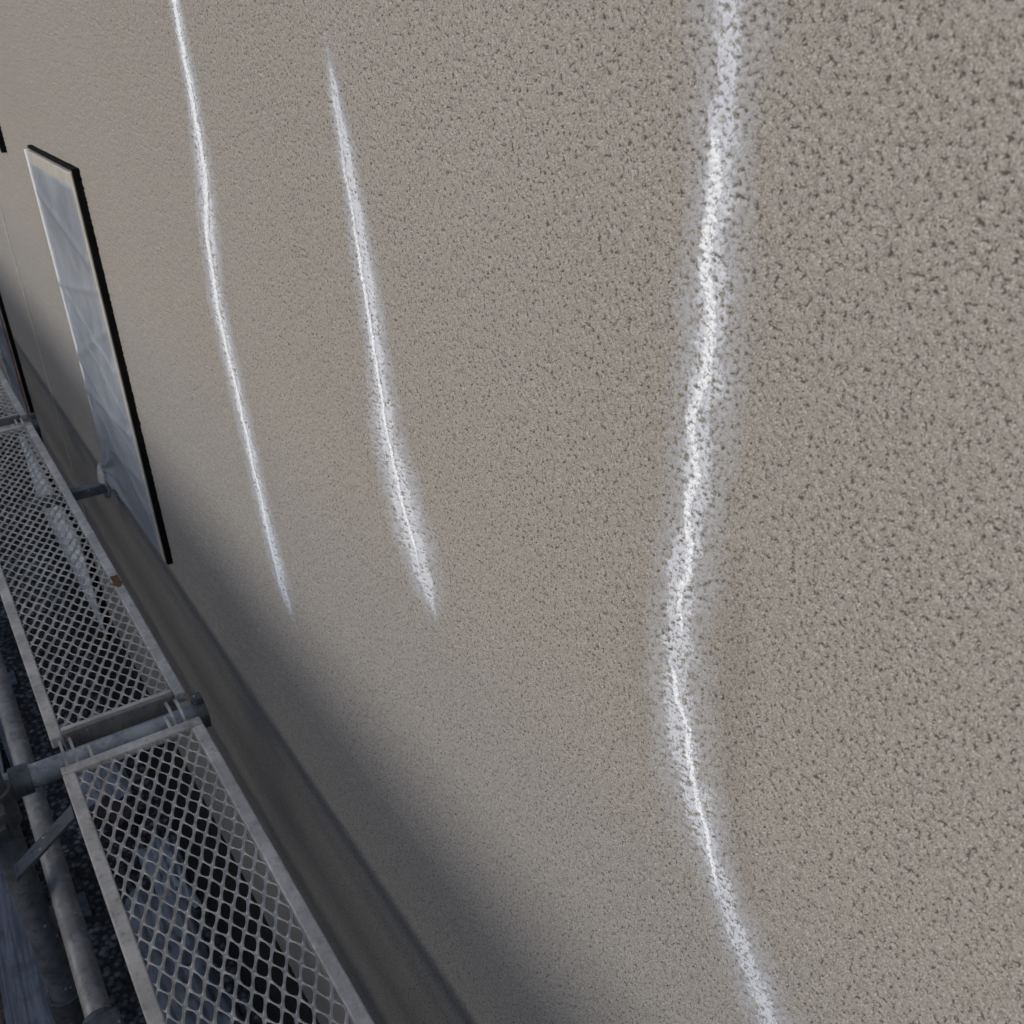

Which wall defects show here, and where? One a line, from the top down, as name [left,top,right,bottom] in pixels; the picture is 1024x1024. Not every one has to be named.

crack [170,0,291,610]
crack [329,63,436,615]
crack [659,0,779,1024]